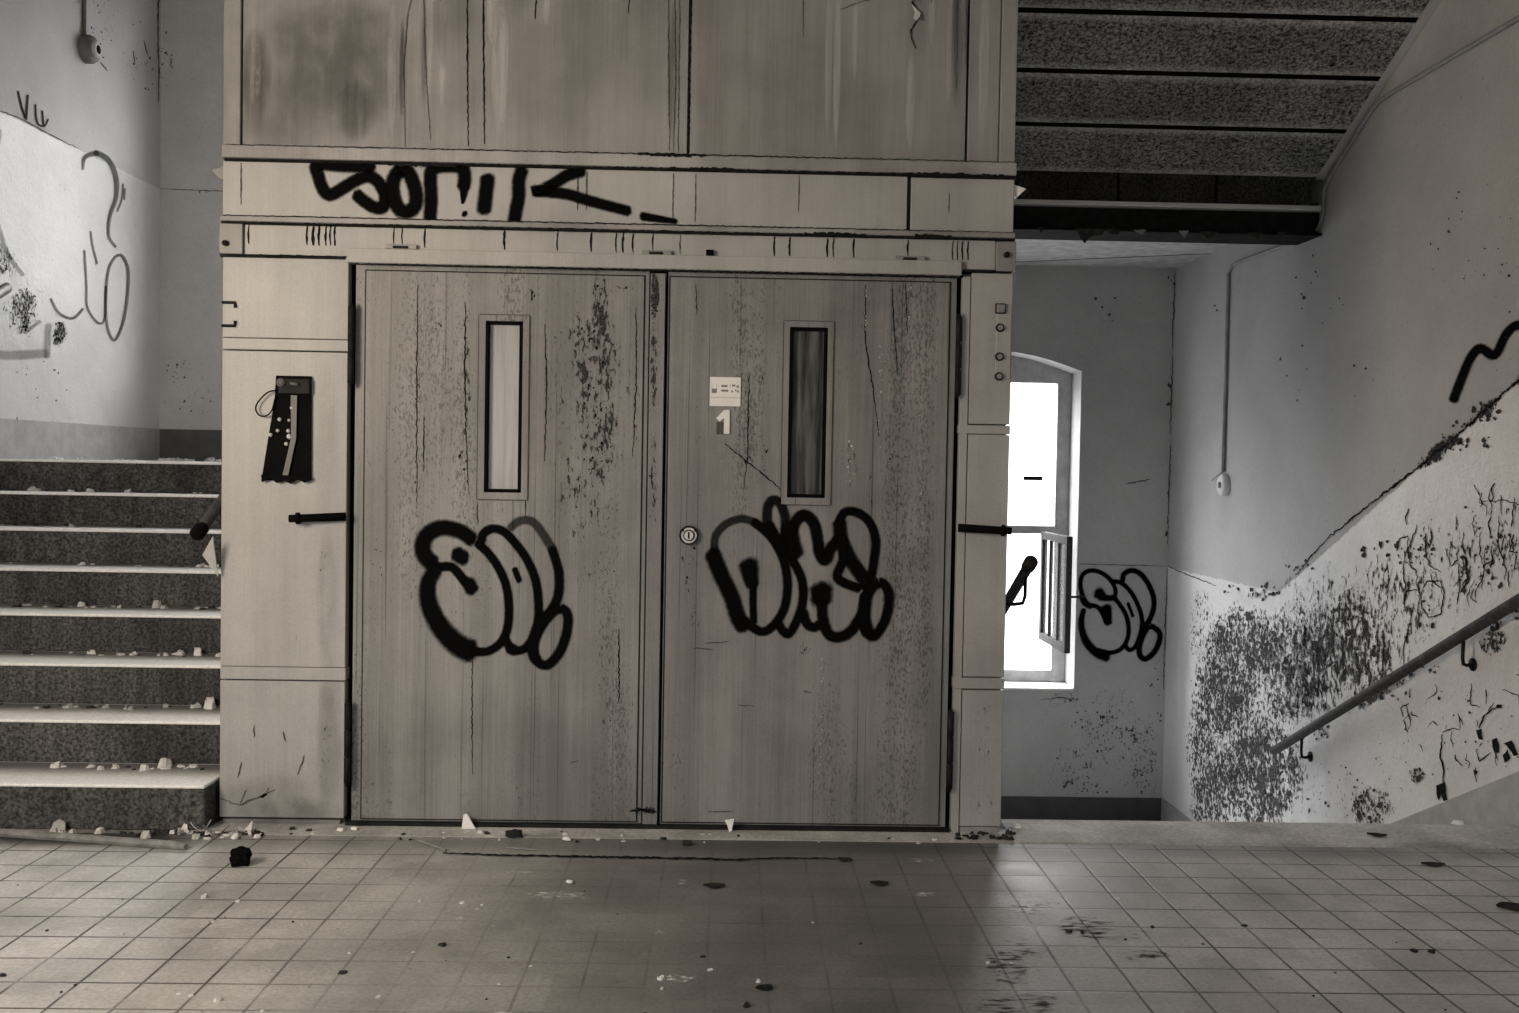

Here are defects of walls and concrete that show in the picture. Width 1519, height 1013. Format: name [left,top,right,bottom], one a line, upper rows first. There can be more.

peeling [1168,379,1519,823]